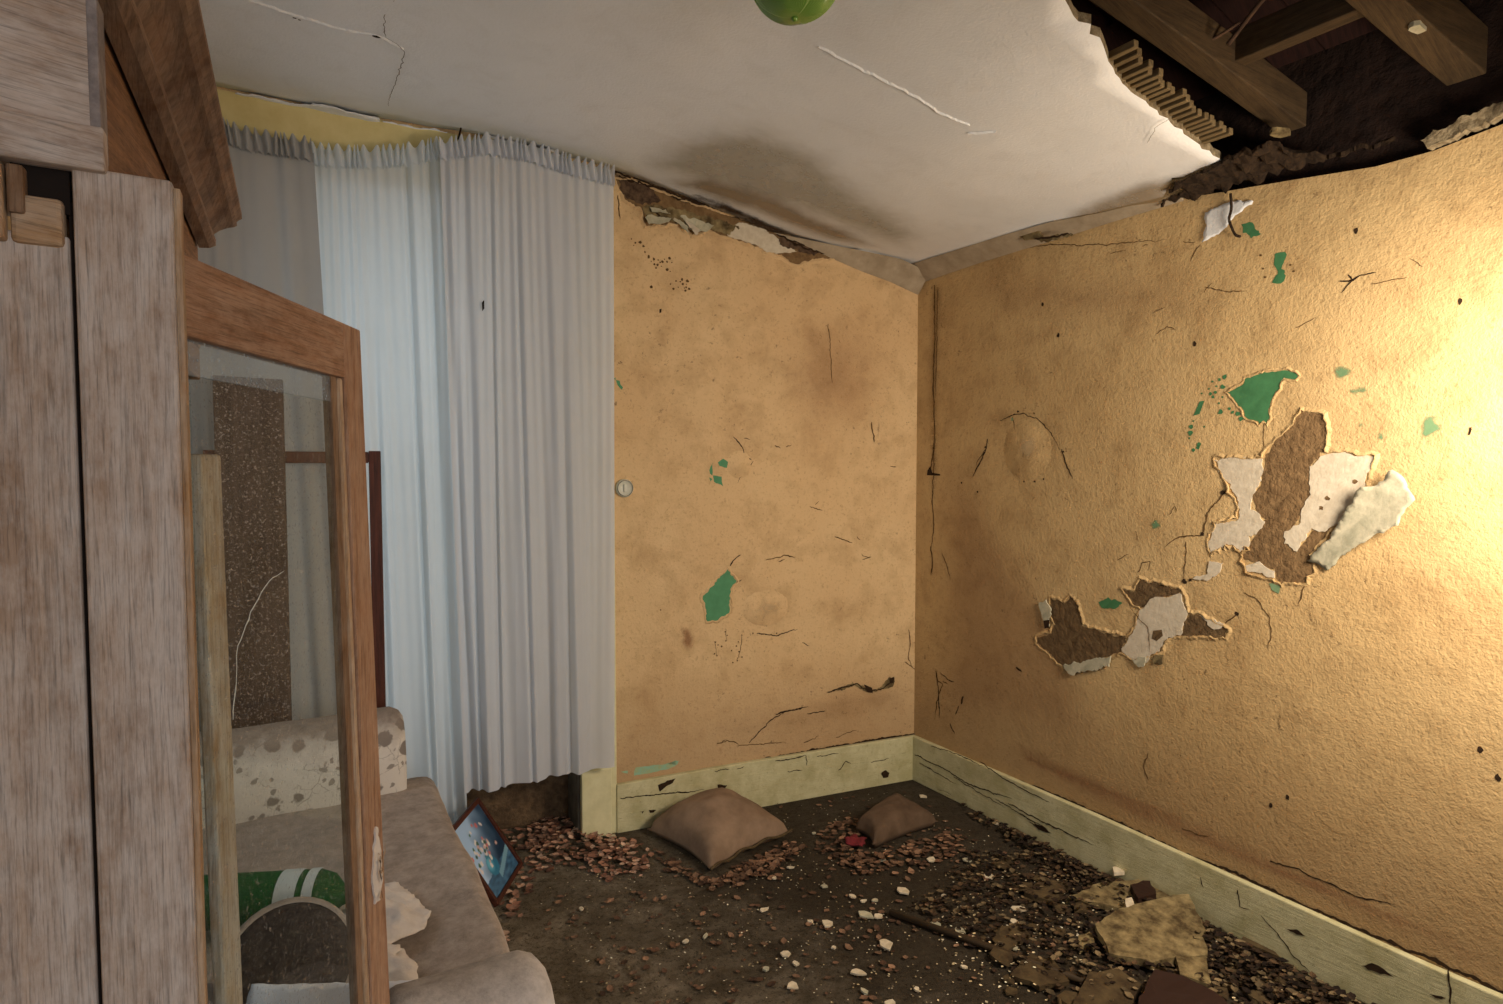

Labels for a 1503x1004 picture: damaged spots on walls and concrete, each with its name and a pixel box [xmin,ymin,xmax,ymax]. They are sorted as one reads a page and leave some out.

crack [383,1,405,106]
flaking render [1421,101,1503,151]
flaking render [615,171,836,268]
leakage [656,182,850,239]
peeling [1202,200,1261,242]
peeling [1259,252,1295,284]
flaking render [1034,366,1415,675]
peeling [699,566,740,624]
crack [620,629,1092,845]
crack [1200,877,1309,971]
crack [1445,967,1453,1004]